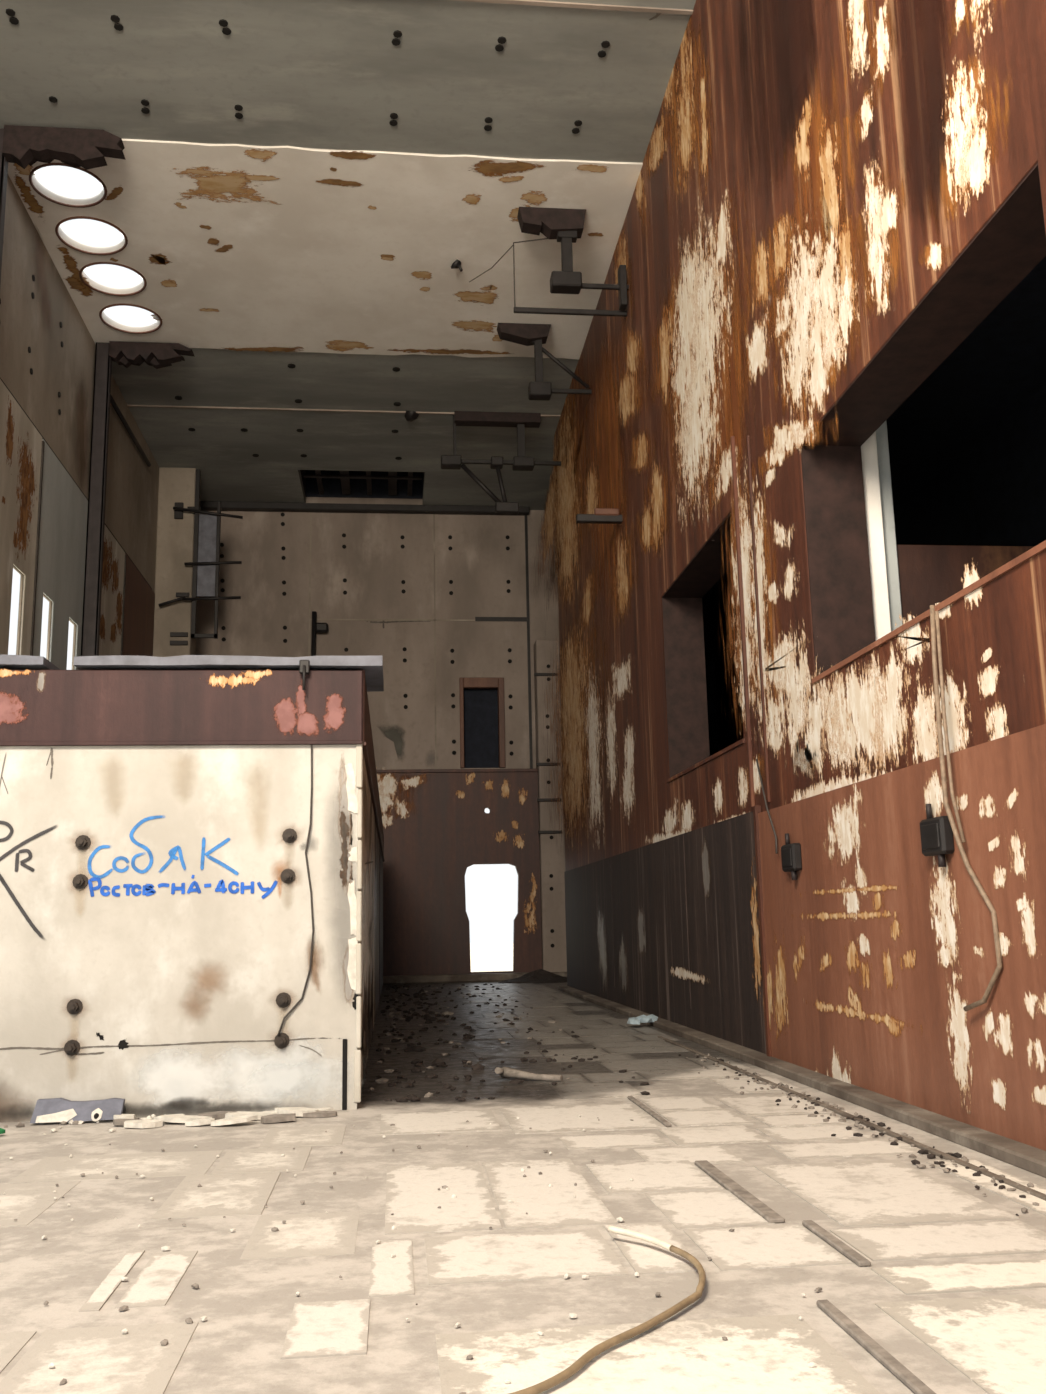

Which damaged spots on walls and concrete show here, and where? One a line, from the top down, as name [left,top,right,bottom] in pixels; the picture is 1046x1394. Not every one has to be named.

peeling [469,160,547,222]
corrosion [740,0,843,273]
corrosion [900,0,944,220]
corrosion [2,395,36,558]
corrosion [585,337,631,603]
corrosion [703,277,747,488]
peeling [534,0,1019,1040]
peeling [209,669,272,688]
peeling [273,681,346,737]
peeling [377,768,427,829]
leakage [361,848,373,1003]
peeling [929,830,1046,1113]